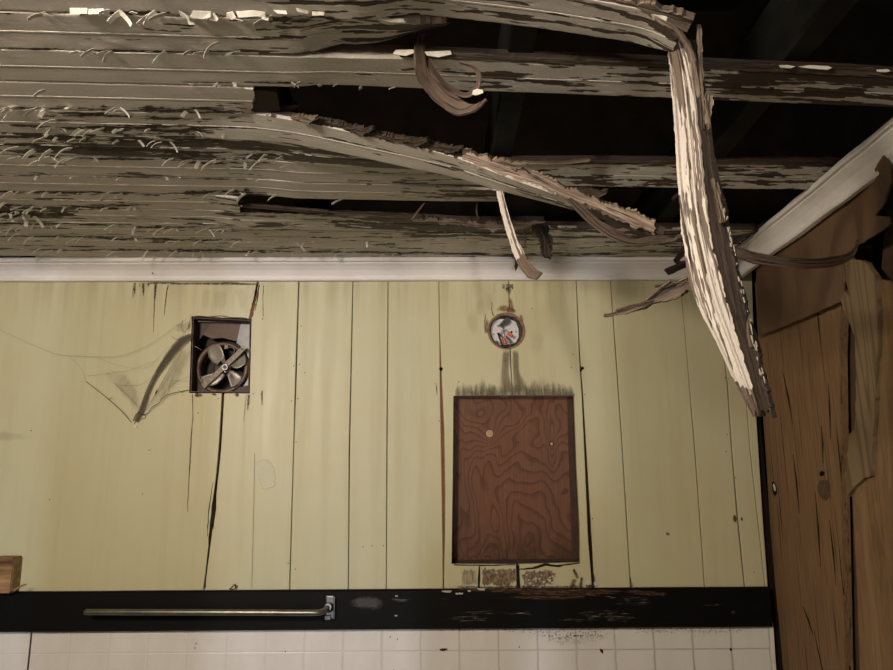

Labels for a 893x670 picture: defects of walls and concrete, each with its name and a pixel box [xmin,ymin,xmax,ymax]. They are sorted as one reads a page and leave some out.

peeling [16,41,247,64]
peeling [70,8,335,28]
peeling [0,89,469,261]
spalling [693,78,777,418]
damp [502,352,524,392]
crack [187,394,219,588]